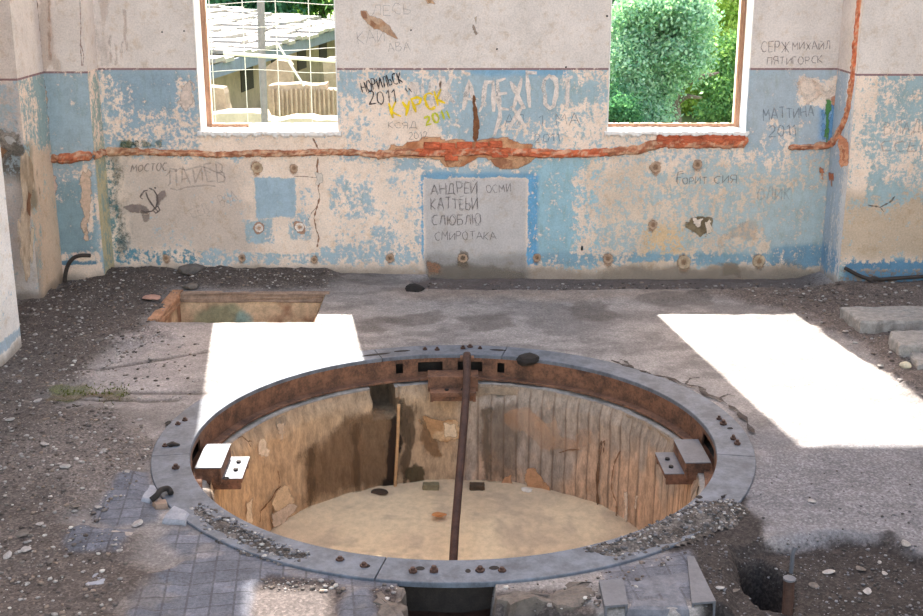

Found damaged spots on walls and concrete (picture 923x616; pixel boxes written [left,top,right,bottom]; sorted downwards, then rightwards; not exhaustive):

flaking render [361,11,398,39]
flaking render [388,137,551,169]
flaking render [656,135,749,146]
flaking render [0,129,35,281]
peeling [80,170,91,241]
crack [294,138,323,247]
flaking render [685,216,713,237]
crack [611,359,755,432]